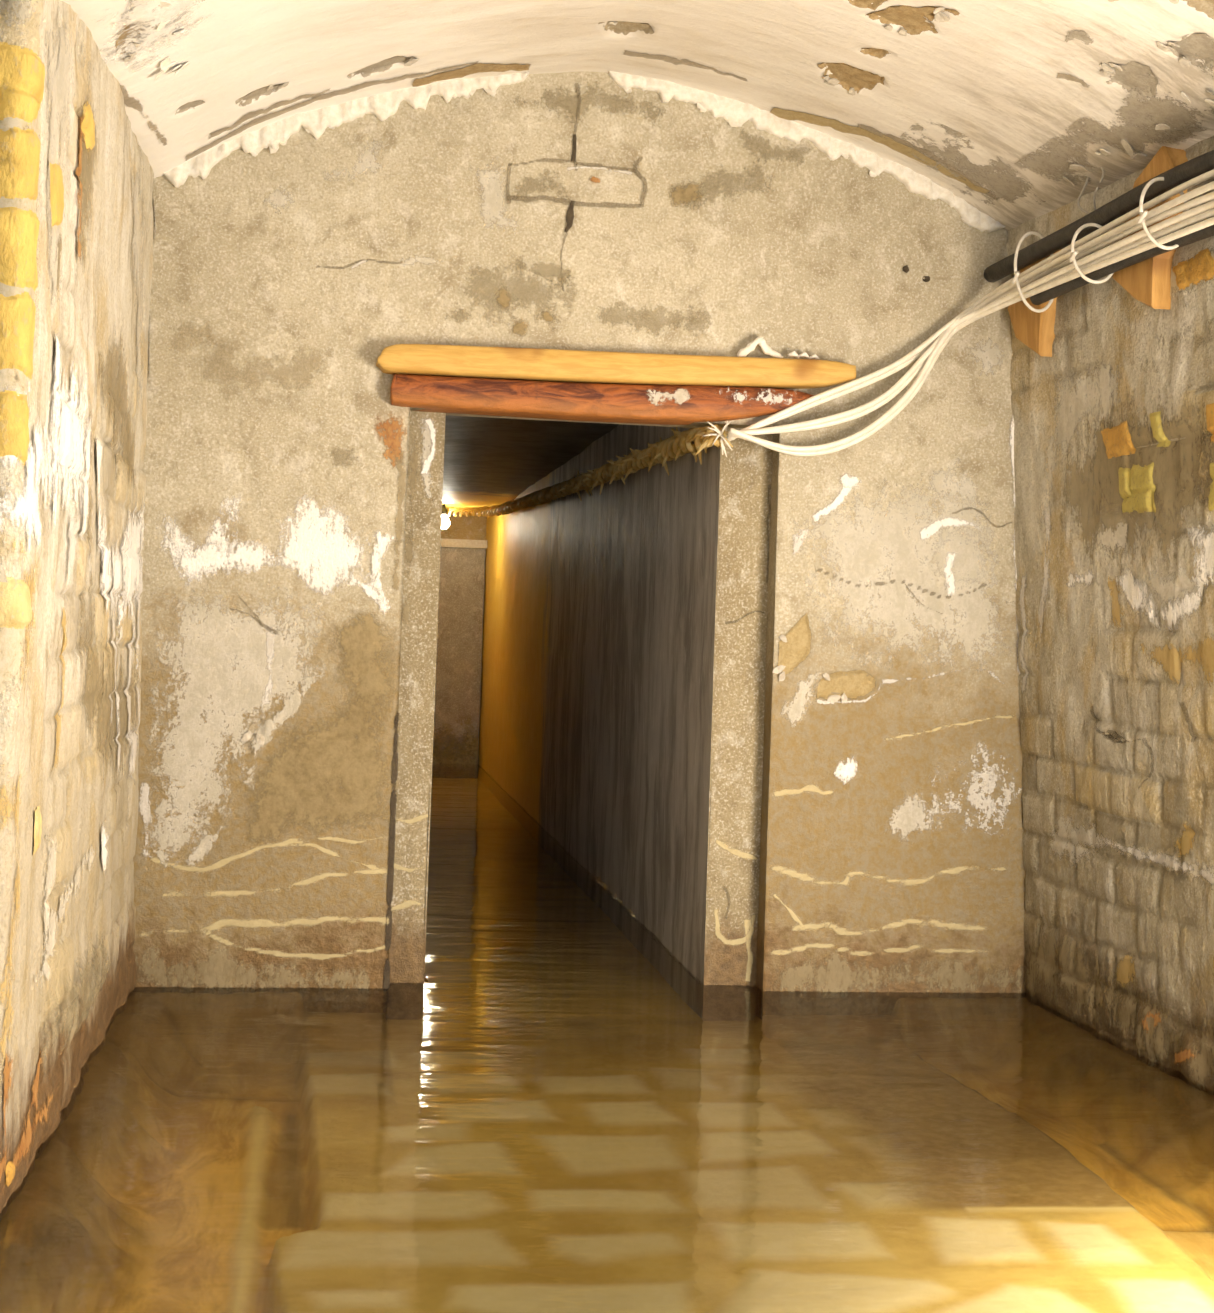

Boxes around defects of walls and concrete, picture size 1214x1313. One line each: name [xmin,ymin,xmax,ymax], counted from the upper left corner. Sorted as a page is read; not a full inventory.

peeling [102,0,204,81]
flaking render [849,0,960,36]
flaking render [1169,0,1214,19]
peeling [608,33,1214,233]
damp [0,169,428,872]
flaking render [772,614,811,681]
flaking render [815,670,876,704]
damp [295,862,416,885]